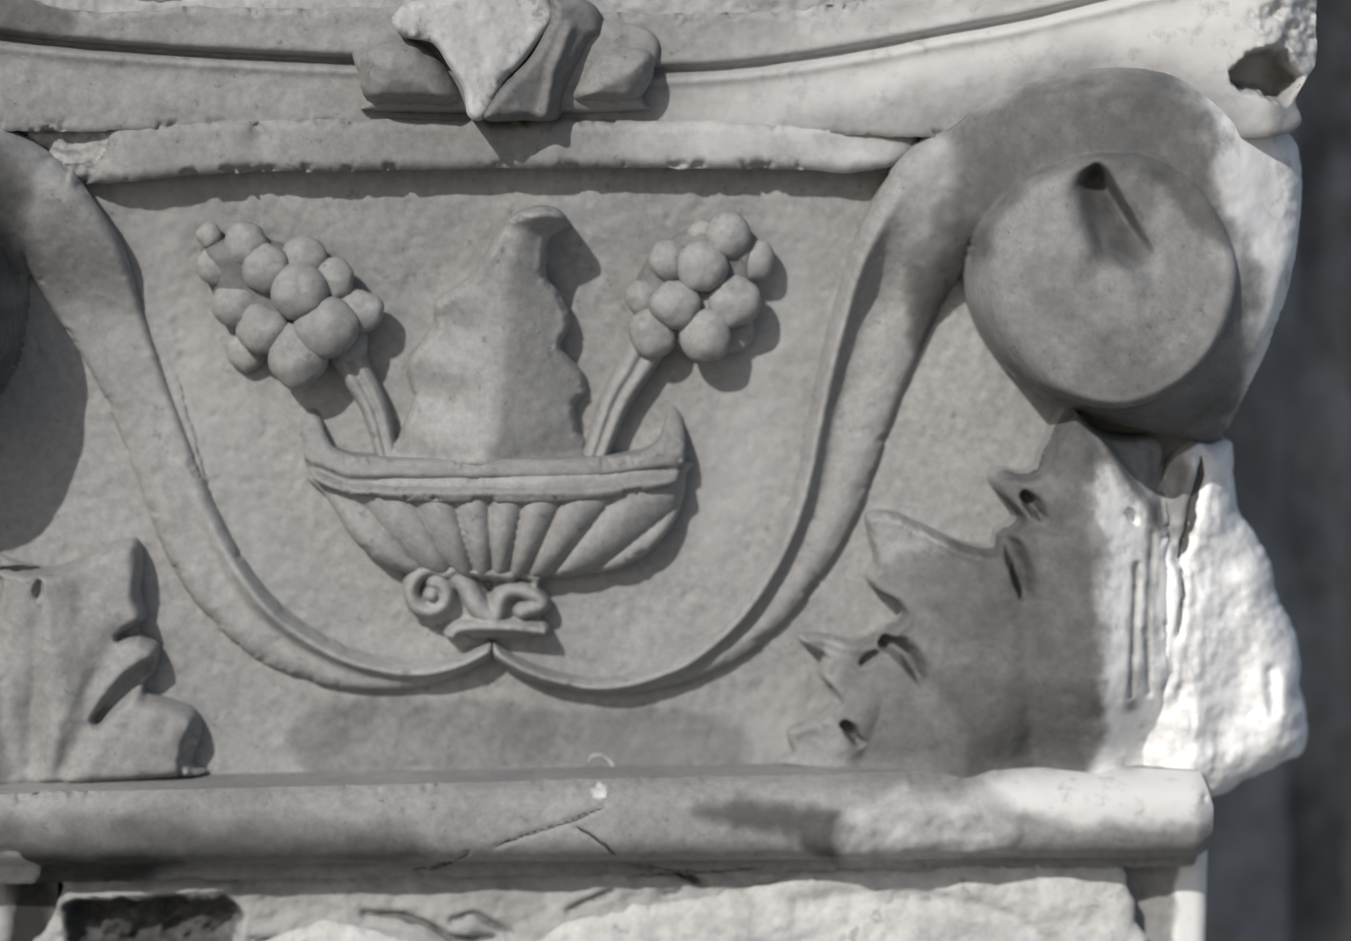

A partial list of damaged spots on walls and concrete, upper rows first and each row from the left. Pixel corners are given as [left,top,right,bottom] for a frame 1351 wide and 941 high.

spalling [1232,48,1295,103]
crack [1177,455,1204,632]
water stain [845,464,1213,905]
crack [415,807,762,896]
spalling [62,895,241,941]
crack [569,892,609,910]